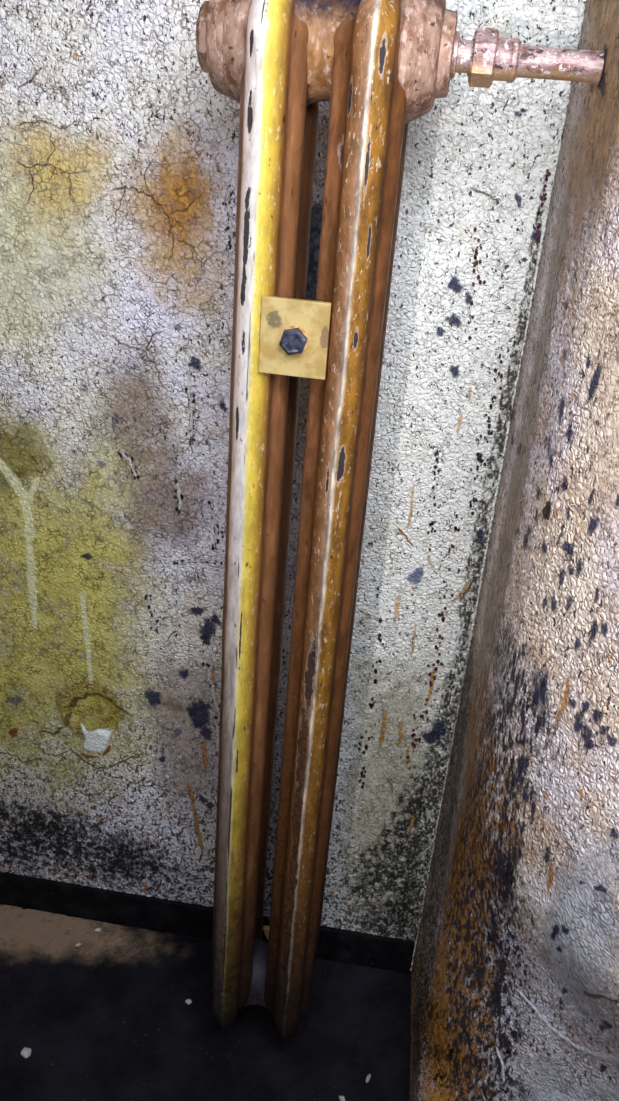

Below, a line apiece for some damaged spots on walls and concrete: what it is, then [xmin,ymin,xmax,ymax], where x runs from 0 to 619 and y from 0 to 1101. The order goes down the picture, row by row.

crack [16,120,88,207]
crack [111,160,204,271]
water stain [0,428,141,752]
water stain [423,0,619,1101]
flaking render [41,683,132,758]
water stain [0,801,201,895]